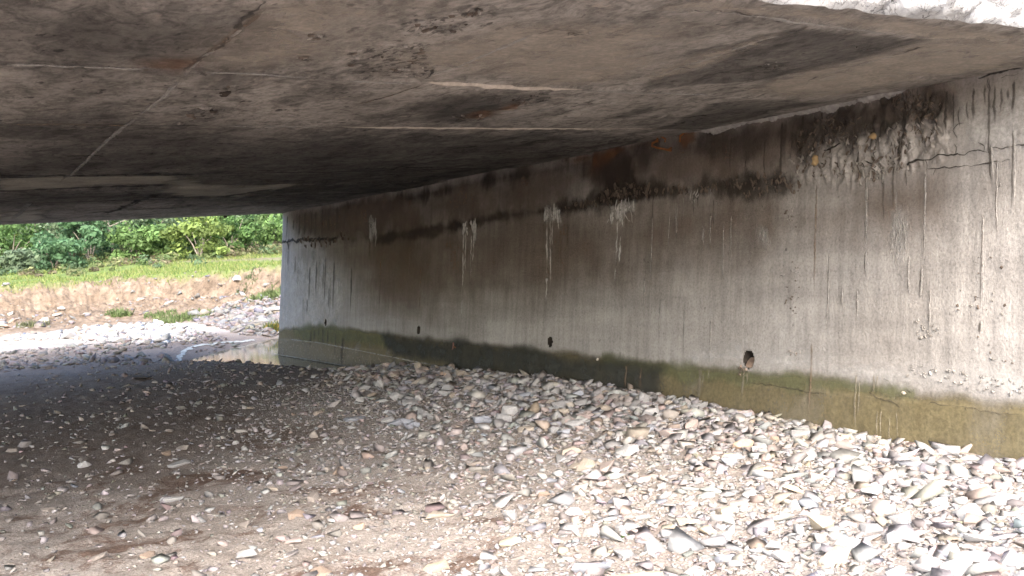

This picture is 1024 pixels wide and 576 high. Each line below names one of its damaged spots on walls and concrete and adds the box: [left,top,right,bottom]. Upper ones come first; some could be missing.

crack [186,1,266,68]
damp [0,7,1024,306]
crack [907,123,1024,175]
crack [282,237,336,249]
damp [278,253,1024,460]